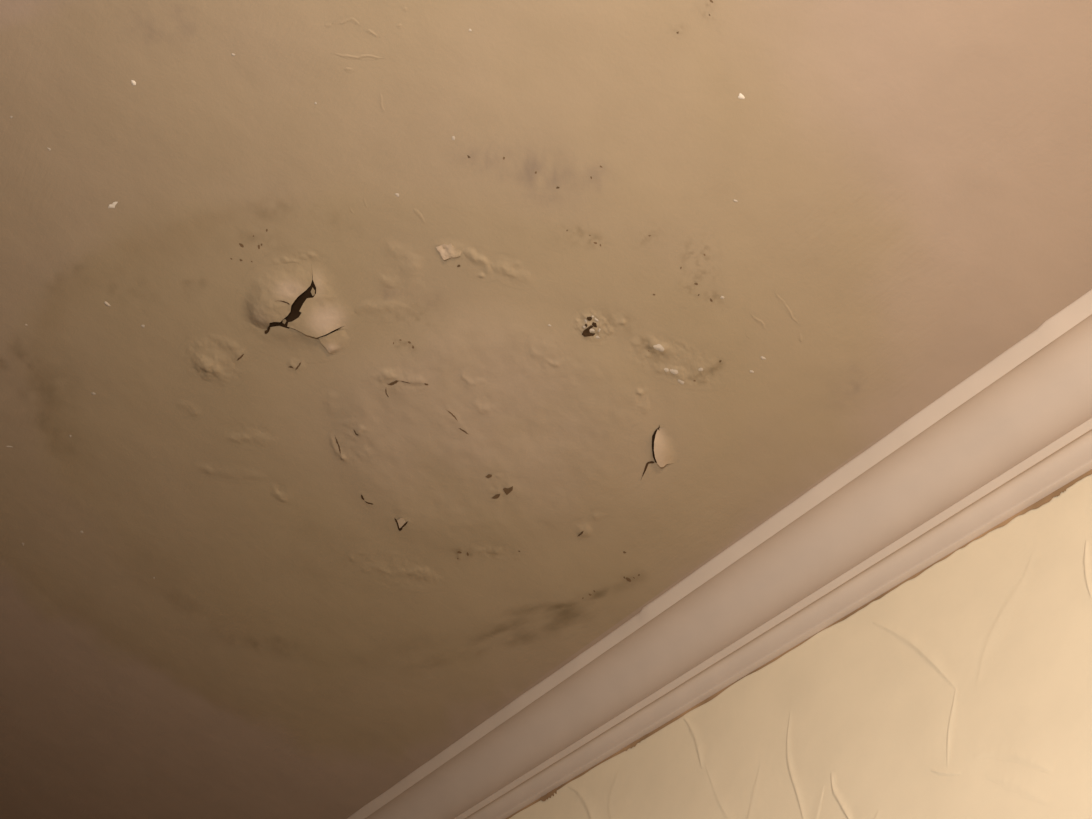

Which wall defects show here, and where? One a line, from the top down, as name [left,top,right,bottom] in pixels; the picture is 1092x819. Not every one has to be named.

leakage [22,204,230,360]
peeling [570,307,617,345]
leakage [673,225,731,313]
leakage [0,327,92,463]
leakage [48,443,105,510]
peeling [628,423,681,479]
leakage [611,563,656,592]
leakage [0,525,317,744]
leakage [309,620,498,678]
leakage [390,580,630,681]